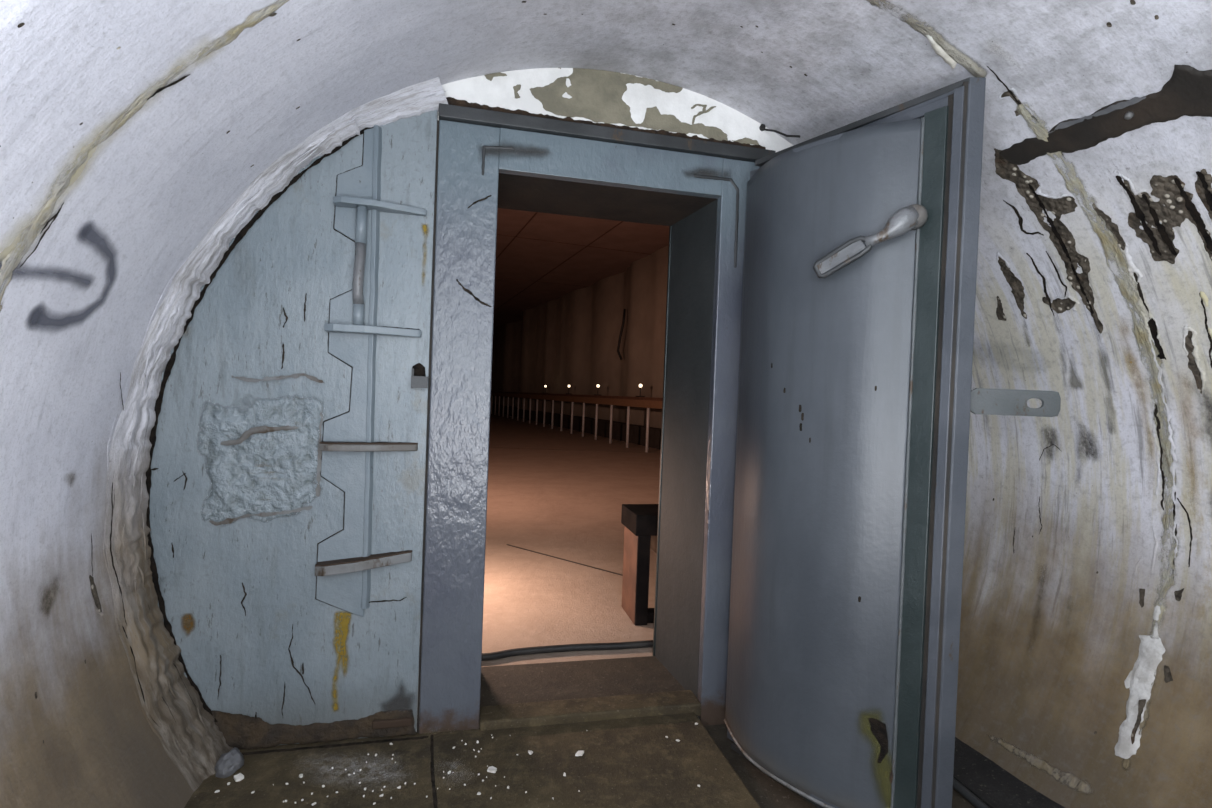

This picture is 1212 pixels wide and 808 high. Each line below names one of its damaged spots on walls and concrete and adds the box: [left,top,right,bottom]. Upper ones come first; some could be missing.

crack [147,74,190,100]
peeling [484,68,760,145]
crack [1003,200,1067,315]
water stain [1071,367,1081,388]
spalling [994,148,1212,334]
water stain [1101,354,1110,390]
crack [1133,272,1149,313]
spalling [1147,313,1166,360]
crack [1199,291,1212,368]
rust [146,127,416,750]
water stain [1079,432,1097,457]
rust [861,713,893,808]